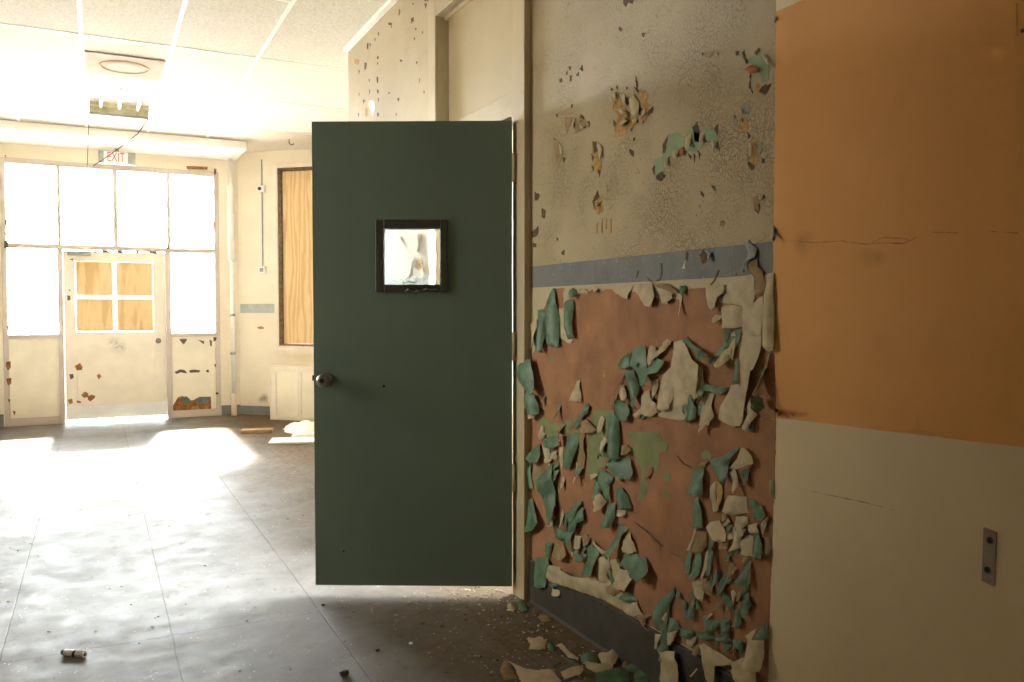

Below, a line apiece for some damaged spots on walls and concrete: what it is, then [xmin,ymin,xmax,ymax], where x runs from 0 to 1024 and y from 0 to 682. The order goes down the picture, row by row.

peeling [354,0,428,117]
peeling [553,104,590,168]
peeling [591,141,602,176]
peeling [611,76,654,156]
peeling [652,121,719,182]
peeling [733,48,771,171]
peeling [531,192,546,247]
peeling [592,191,612,234]
peeling [516,240,776,682]